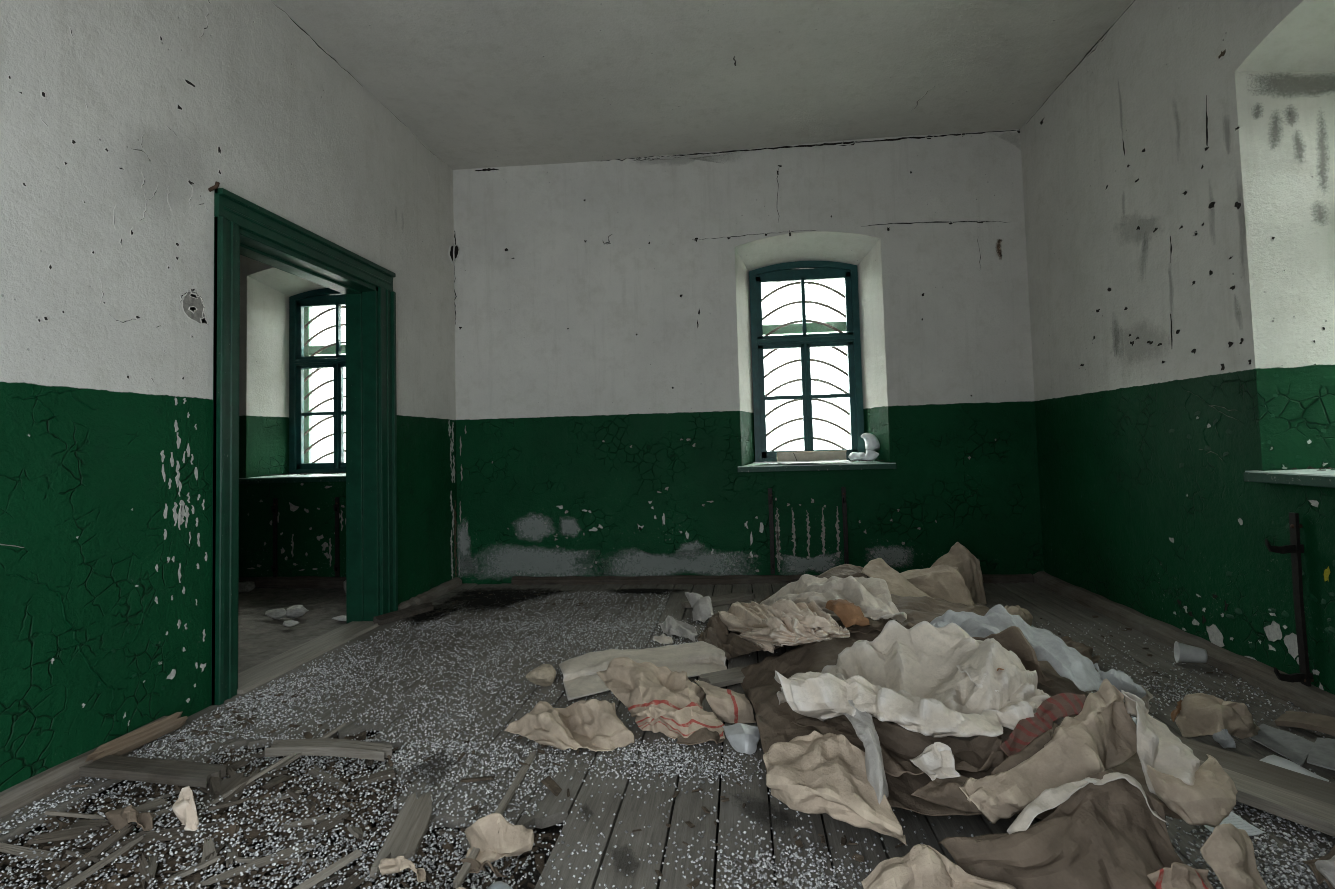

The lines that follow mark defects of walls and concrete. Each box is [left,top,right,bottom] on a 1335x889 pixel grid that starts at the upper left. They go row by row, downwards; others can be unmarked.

leakage [1255,74,1335,145]
leakage [1295,121,1327,188]
flaking render [179,288,208,339]
crack [13,385,98,422]
peeling [160,398,207,569]
peeling [448,420,604,579]
peeling [637,486,669,531]
peeling [614,497,841,577]
peeling [155,556,197,605]
peeling [157,660,177,681]
peeling [181,646,207,704]
peeling [1173,593,1325,691]